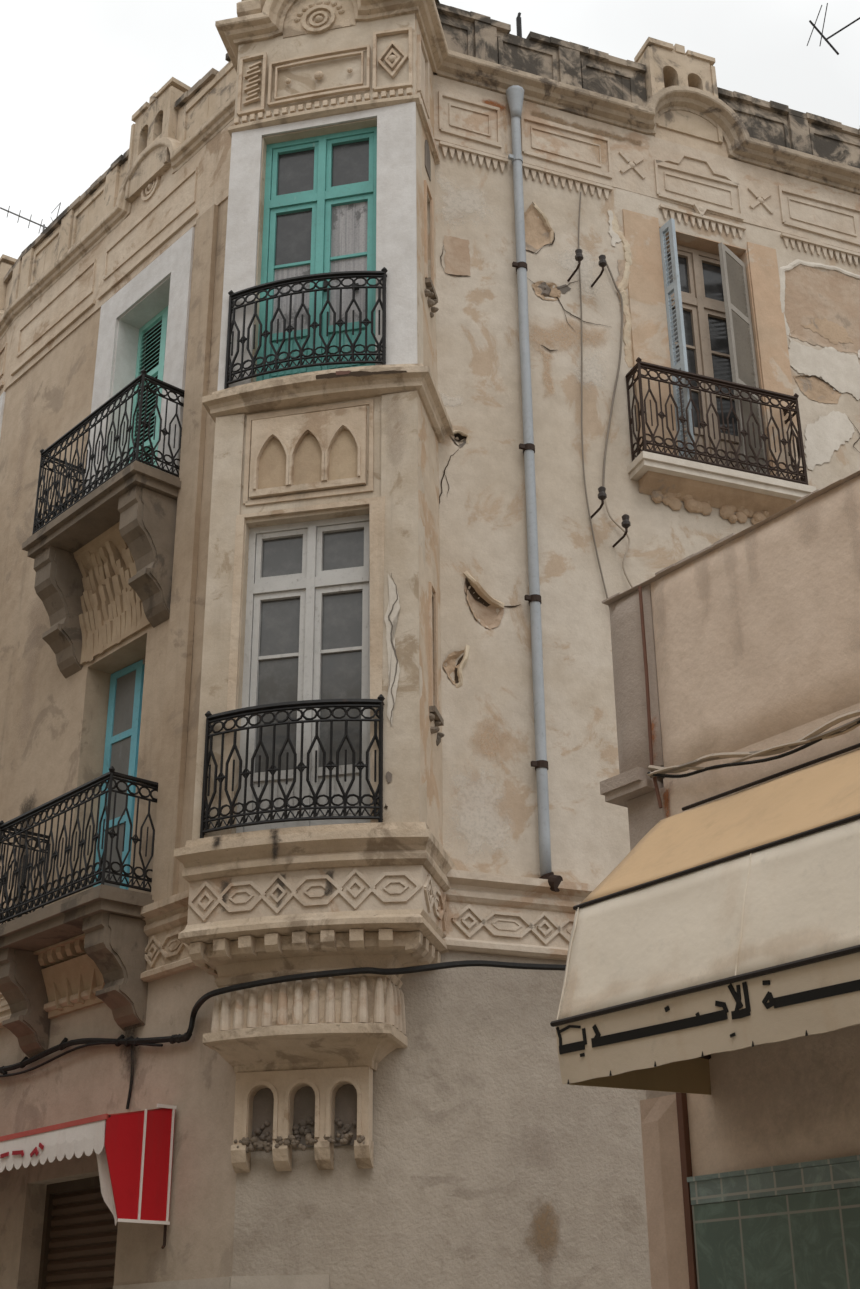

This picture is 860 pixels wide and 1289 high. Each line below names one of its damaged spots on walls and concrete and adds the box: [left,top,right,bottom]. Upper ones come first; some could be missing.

flaking render [524,202,593,301]
peeling [779,259,860,470]
flaking render [463,571,521,630]
flaking render [443,645,470,688]